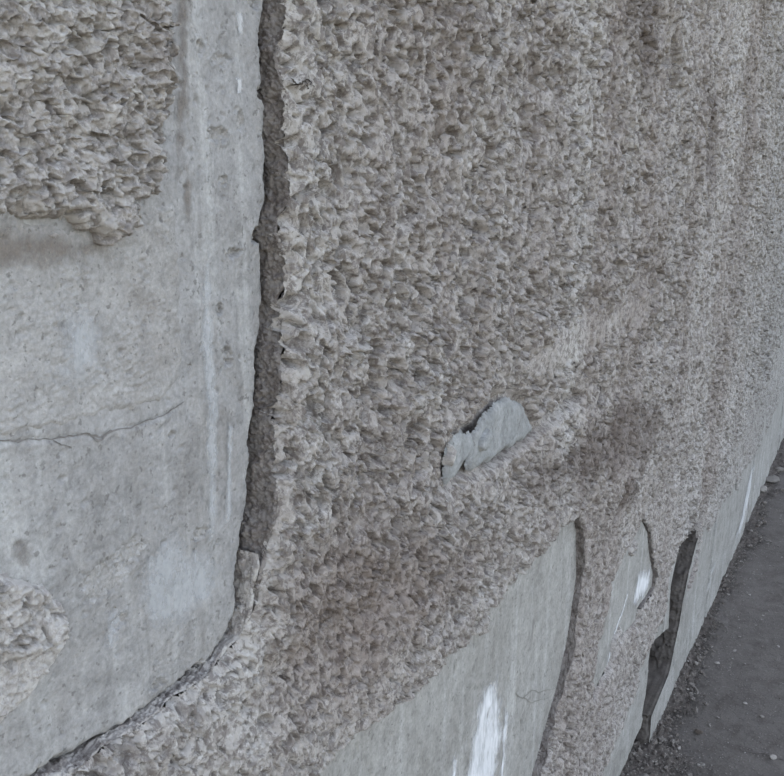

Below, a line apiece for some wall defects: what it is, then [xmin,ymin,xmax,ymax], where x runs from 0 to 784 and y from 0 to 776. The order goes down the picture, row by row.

spalling [0,203,182,437]
spalling [238,0,290,606]
crack [0,402,183,447]
spalling [441,397,532,485]
flaking render [0,573,70,722]
spalling [82,538,147,605]
spalling [320,516,585,776]
spalling [593,520,657,687]
spalling [603,652,649,776]
spalling [655,554,677,639]